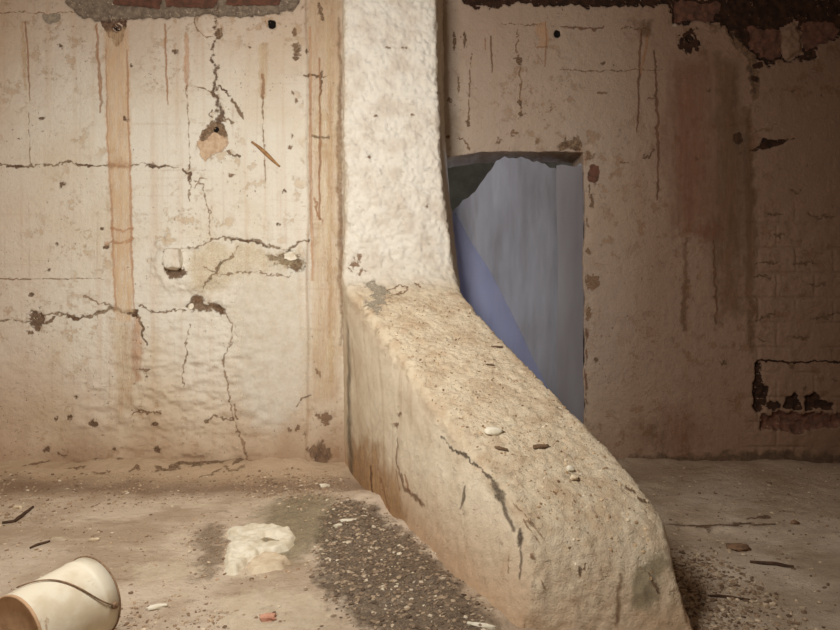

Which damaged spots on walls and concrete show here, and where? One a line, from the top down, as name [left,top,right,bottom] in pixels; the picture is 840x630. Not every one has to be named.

spalling [65,0,300,46]
crack [198,4,244,124]
peeling [292,28,307,61]
spalling [462,0,840,100]
spalling [197,121,241,161]
rust [315,58,323,221]
crack [0,160,309,287]
crack [0,278,191,385]
peeling [364,280,421,315]
crack [155,313,252,477]
spalling [752,362,840,434]
crack [441,436,543,578]